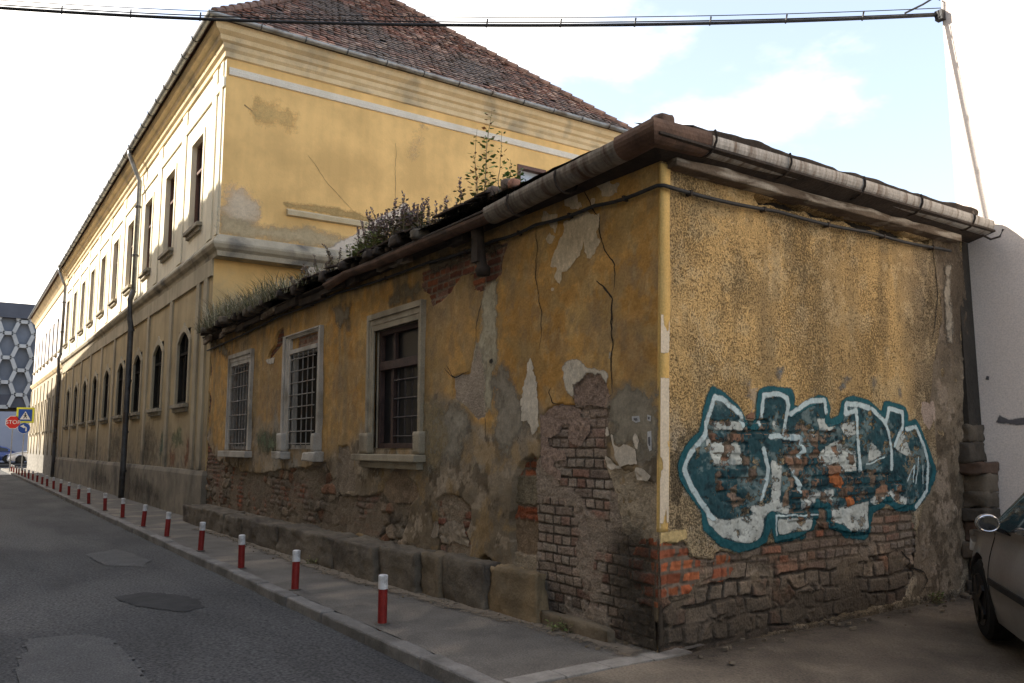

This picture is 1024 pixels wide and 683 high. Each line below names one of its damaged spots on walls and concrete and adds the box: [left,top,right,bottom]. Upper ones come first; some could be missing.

water stain [220,215,343,248]
water stain [284,202,368,222]
flaking render [422,243,508,306]
crack [534,239,542,349]
peeling [541,181,619,291]
crack [584,191,615,401]
flaking render [205,444,412,545]
flaking render [536,240,968,653]